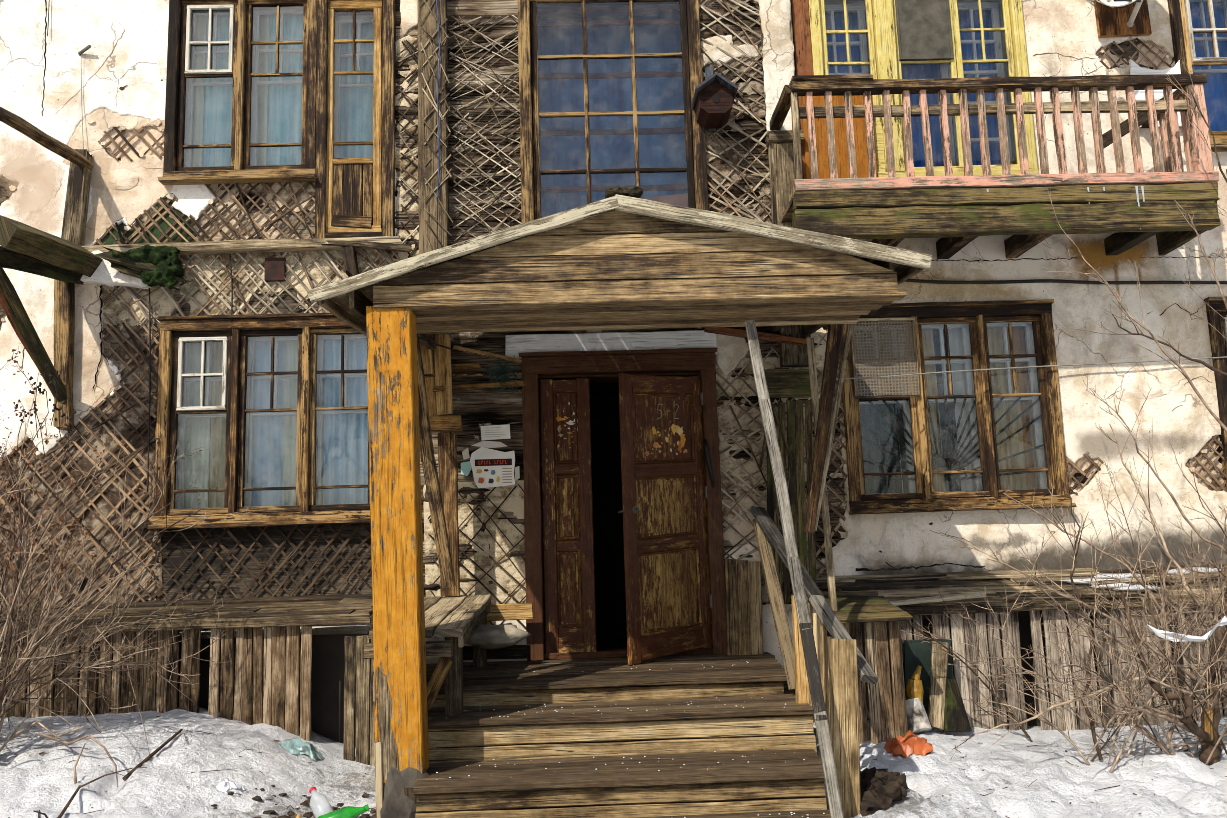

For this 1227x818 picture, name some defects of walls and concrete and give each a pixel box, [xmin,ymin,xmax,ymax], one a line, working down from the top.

crack [41,0,125,116]
peeling [64,108,175,245]
leakage [1067,240,1149,276]
peeling [73,283,124,423]